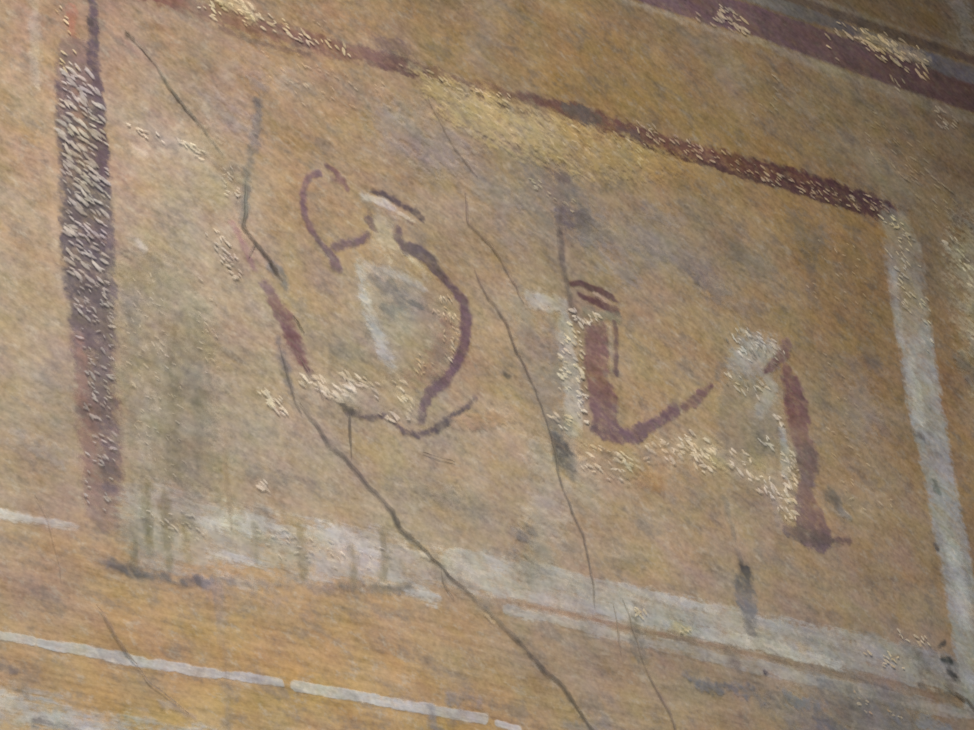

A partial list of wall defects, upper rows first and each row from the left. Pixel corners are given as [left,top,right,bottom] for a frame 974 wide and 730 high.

spalling [56,50,117,418]
crack [241,179,283,281]
crack [427,95,522,300]
crack [281,354,594,730]
crack [475,271,676,730]